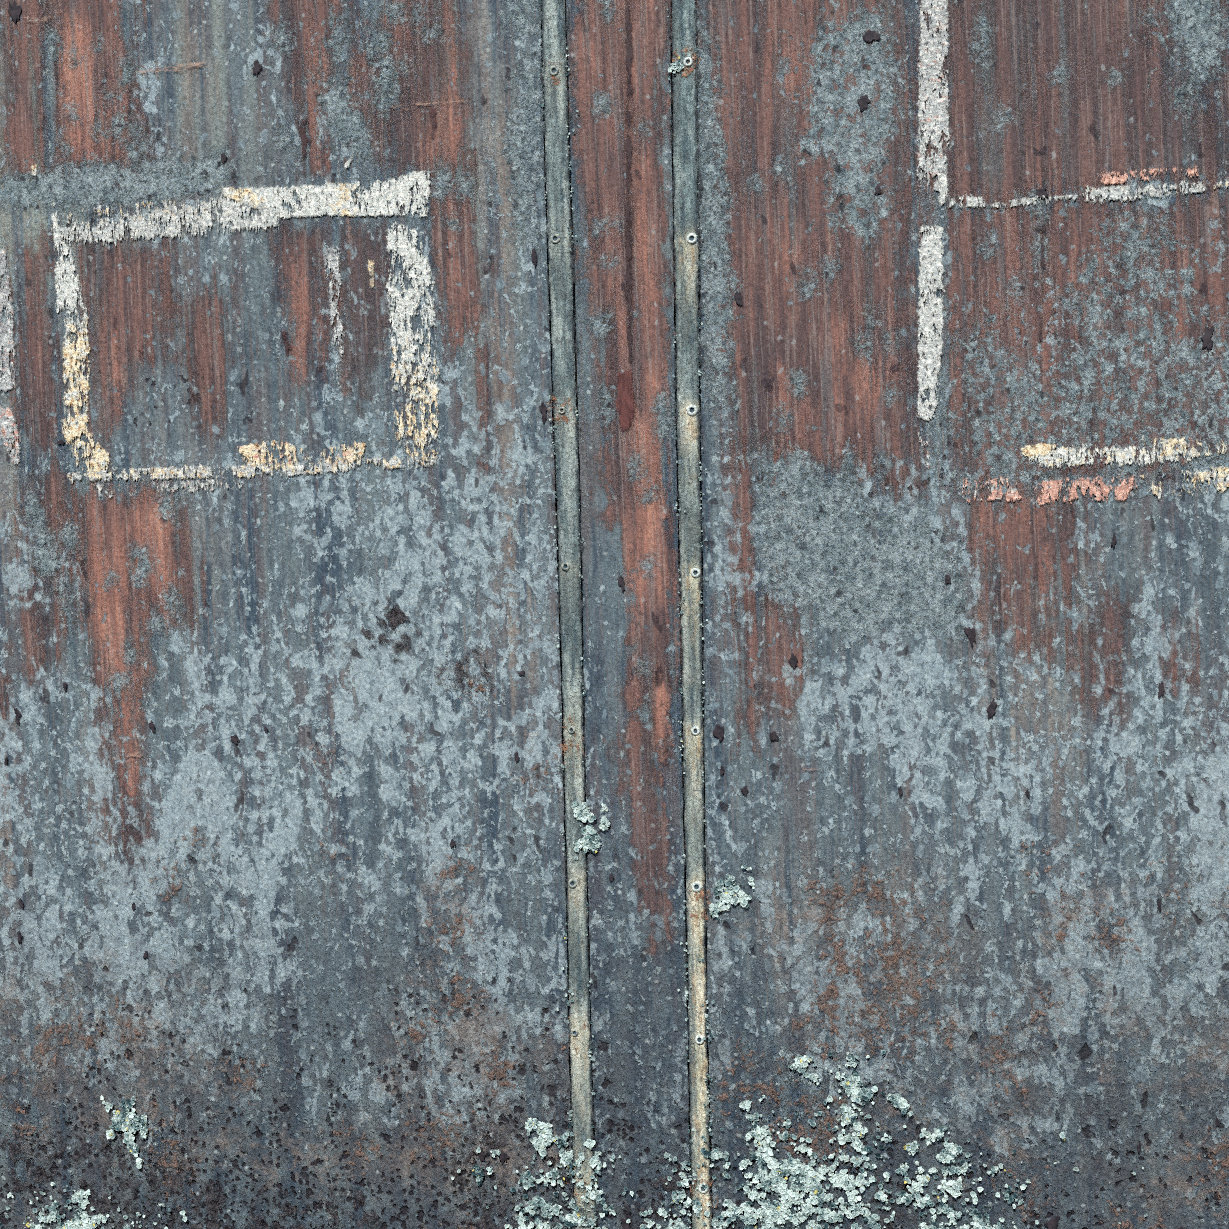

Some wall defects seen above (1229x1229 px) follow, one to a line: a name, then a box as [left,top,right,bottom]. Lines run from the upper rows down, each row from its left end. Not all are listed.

peeling [0,673,21,734]
peeling [0,0,155,182]
peeling [5,223,243,868]
peeling [268,0,504,477]
peeling [567,0,682,956]
peeling [697,0,1229,776]
corrosion [0,995,392,1229]
corrosion [418,845,478,889]
corrosion [383,901,532,1229]
corrosion [615,1137,718,1229]
corrosion [846,1167,920,1229]
corrosion [706,850,1063,1170]